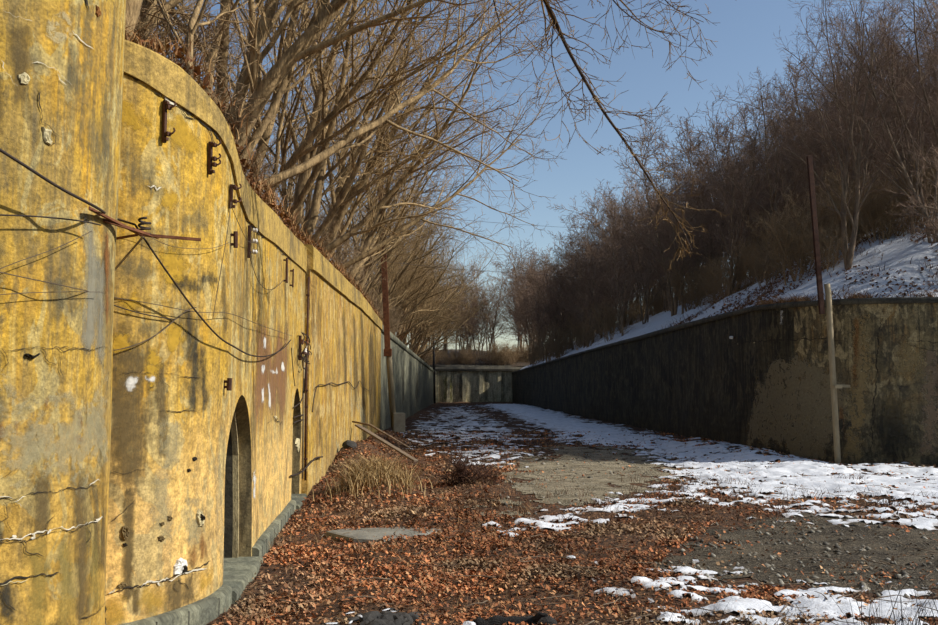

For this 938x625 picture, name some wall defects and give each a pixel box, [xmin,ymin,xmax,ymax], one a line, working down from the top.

peeling [159,235,192,284]
peeling [113,334,130,353]
peeling [167,323,184,352]
peeling [126,350,160,391]
leakage [35,476,51,531]
crack [0,469,144,610]
leakage [74,474,105,617]
spalling [173,558,188,575]
leakage [1,582,13,618]